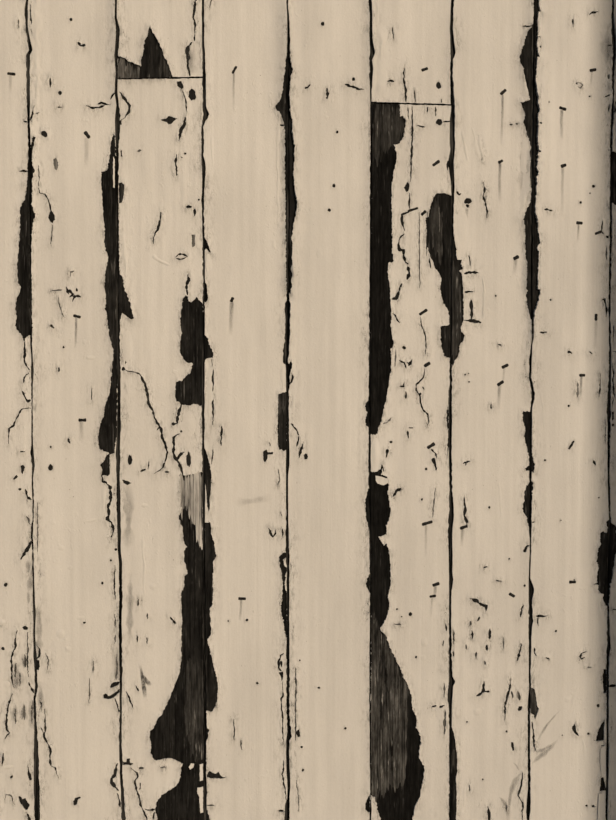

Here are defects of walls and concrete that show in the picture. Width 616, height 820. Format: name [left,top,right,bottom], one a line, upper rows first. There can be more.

peeling [15,137,36,341]
peeling [98,134,134,477]
peeling [117,27,184,89]
crack [125,361,184,474]
peeling [175,283,213,406]
peeling [275,58,297,293]
peeling [365,104,406,435]
peeling [425,193,465,365]
peeling [519,0,541,334]
peeling [522,411,546,526]
peeling [149,450,226,820]
peeling [365,465,424,820]